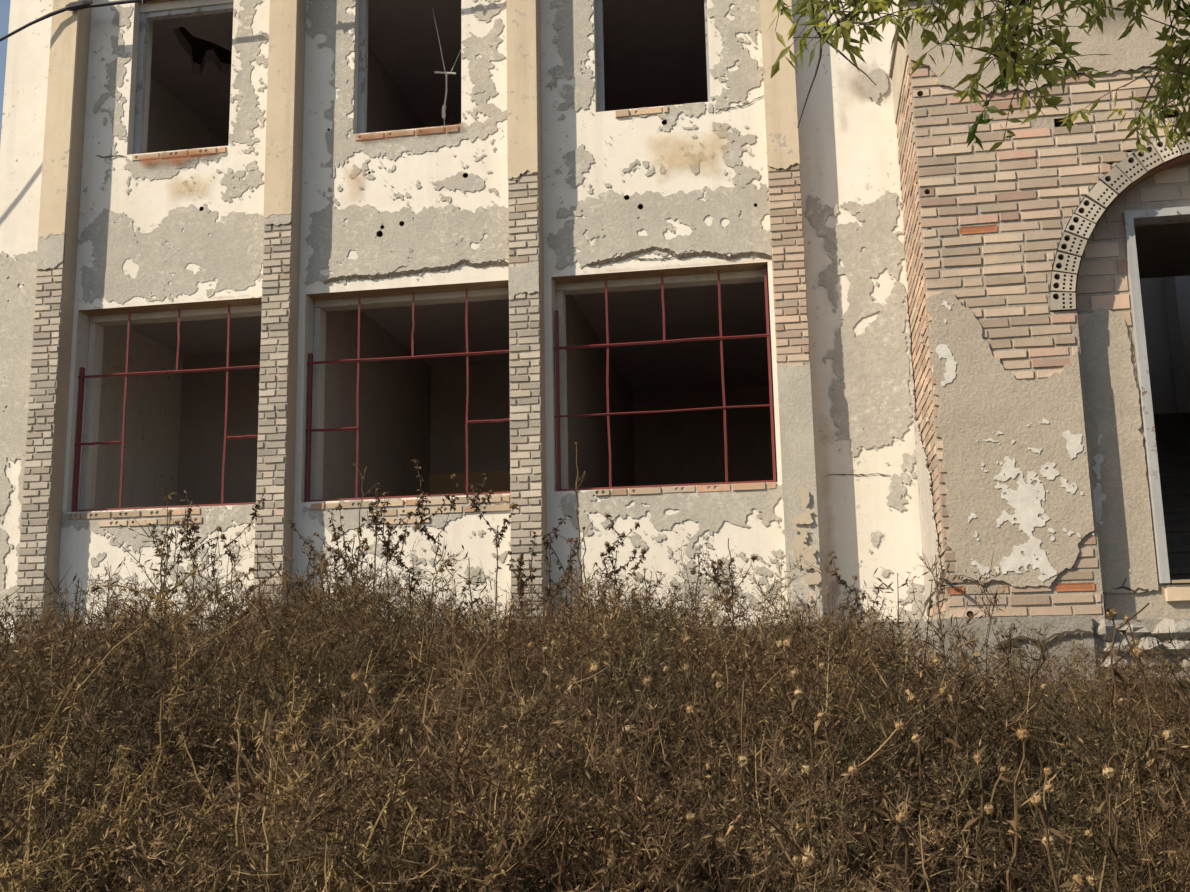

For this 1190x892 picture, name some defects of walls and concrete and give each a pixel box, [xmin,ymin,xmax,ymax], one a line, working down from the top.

crack [587,246,772,267]
crack [323,259,509,284]
peeling [0,0,1190,643]